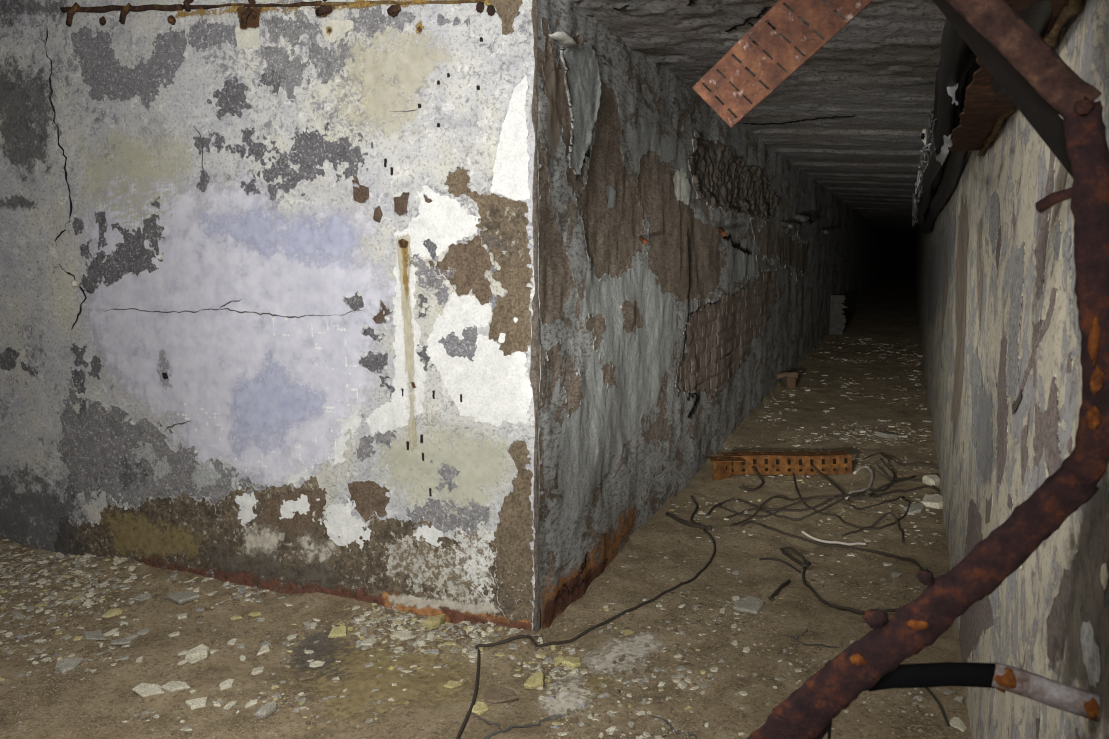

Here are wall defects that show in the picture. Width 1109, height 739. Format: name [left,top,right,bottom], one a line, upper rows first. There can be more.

rust [175,2,298,30]
rust [313,0,431,34]
crack [725,4,785,44]
crack [45,25,362,330]
rust [397,235,416,449]
peeling [54,0,809,631]
rust [941,194,983,455]
rust [1086,316,1104,431]
rust [126,505,636,630]
spalling [392,631,412,640]
rust [993,666,1017,693]
rust [1084,698,1100,721]